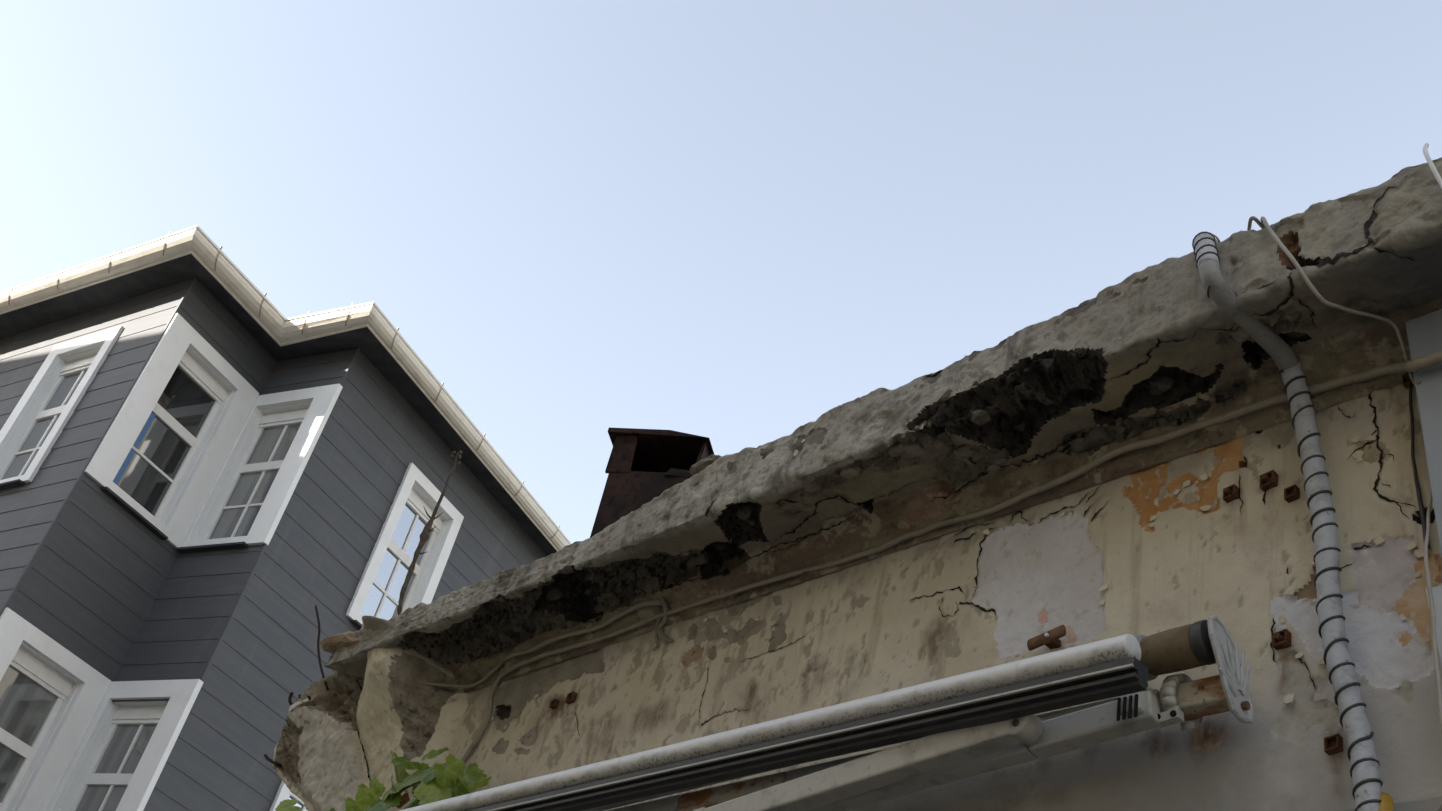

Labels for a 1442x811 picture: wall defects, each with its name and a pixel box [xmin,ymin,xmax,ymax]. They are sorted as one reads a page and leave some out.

crack [1117,186,1419,378]
spalling [1279,332,1312,347]
crack [551,549,702,622]
spalling [388,337,1272,761]
crack [705,434,1084,564]
crack [911,487,1107,617]
peeling [1271,561,1342,746]
crack [1338,392,1416,519]
peeling [1340,507,1442,703]
spalling [273,672,364,784]